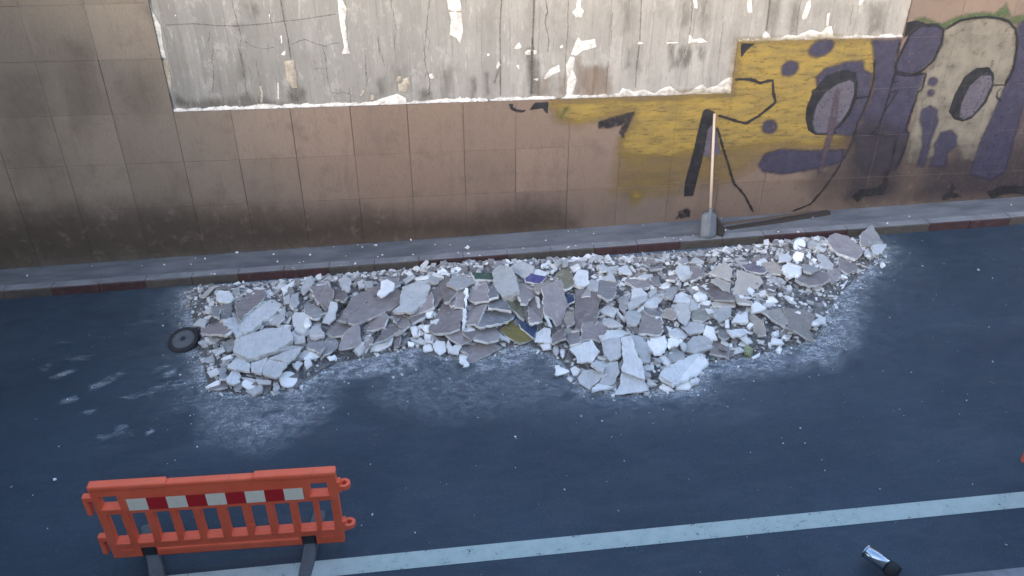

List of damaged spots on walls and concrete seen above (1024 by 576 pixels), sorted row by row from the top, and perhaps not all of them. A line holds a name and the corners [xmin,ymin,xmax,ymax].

peeling [149,0,911,112]
damp [0,216,403,260]